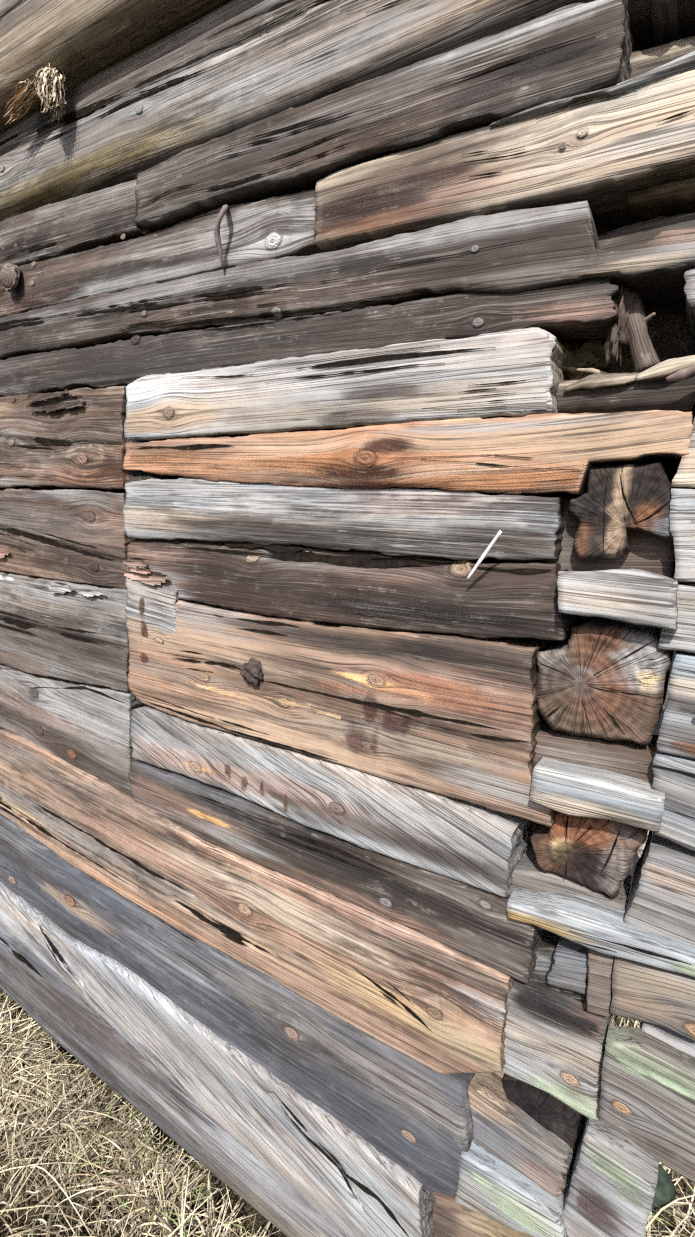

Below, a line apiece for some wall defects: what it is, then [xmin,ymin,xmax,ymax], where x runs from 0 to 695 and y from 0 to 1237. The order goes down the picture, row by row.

crack [0,798,272,955]
crack [349,964,432,1032]
crack [273,1092,408,1236]